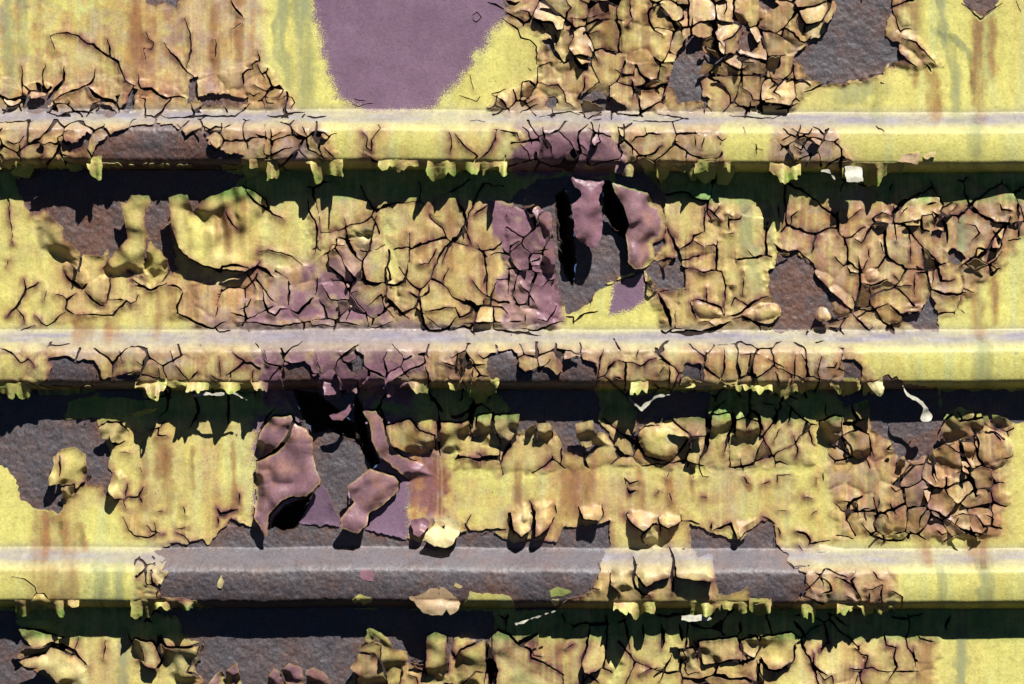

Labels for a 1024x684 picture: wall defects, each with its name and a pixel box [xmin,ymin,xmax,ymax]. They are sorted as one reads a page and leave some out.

crack [0,1,337,161]
rust [211,9,220,70]
crack [352,99,381,162]
peeling [0,0,943,338]
crack [449,0,935,172]
peeling [647,119,1024,341]
crack [2,174,1021,545]
peeling [0,337,1024,684]